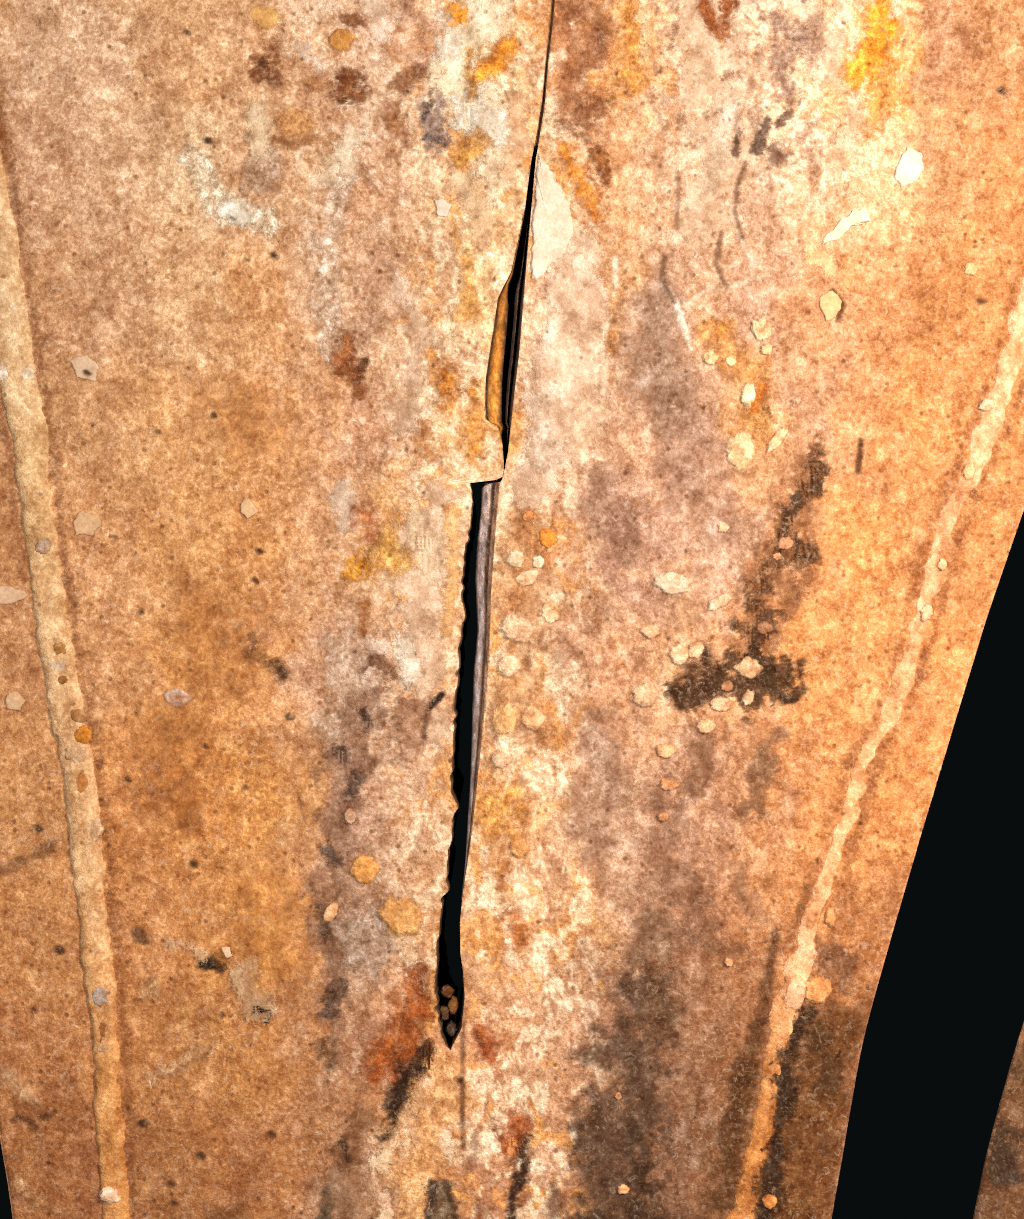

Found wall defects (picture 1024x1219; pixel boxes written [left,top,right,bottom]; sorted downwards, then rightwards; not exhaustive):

rust [844,0,904,141]
leakage [630,232,766,432]
crack [433,0,556,1147]
leakage [581,471,640,564]
leakage [662,457,734,541]
leakage [736,727,789,819]
rust [358,941,435,1092]
leakage [548,712,747,1219]
leakage [708,866,864,1219]
leakage [988,1118,1024,1187]